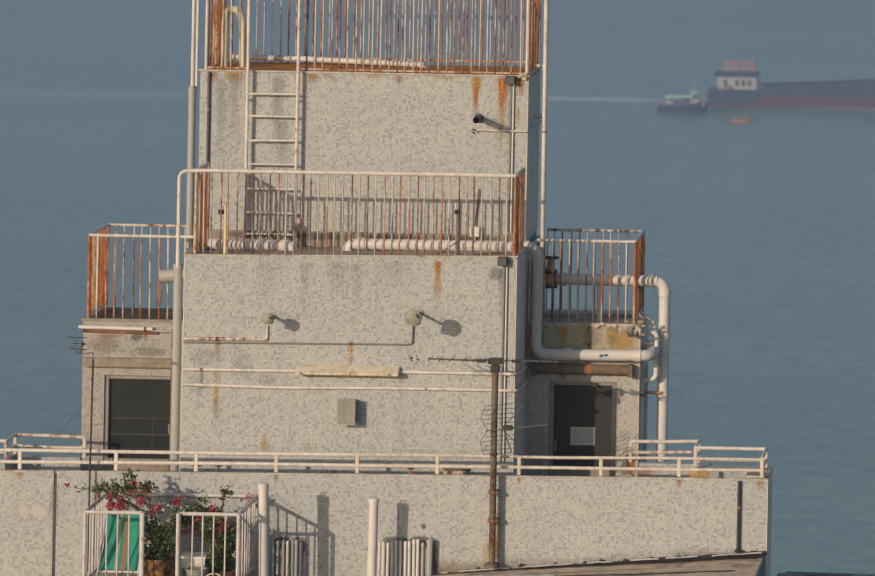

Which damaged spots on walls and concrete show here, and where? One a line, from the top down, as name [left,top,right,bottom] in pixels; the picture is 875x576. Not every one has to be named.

corrosion [211,61,525,125]